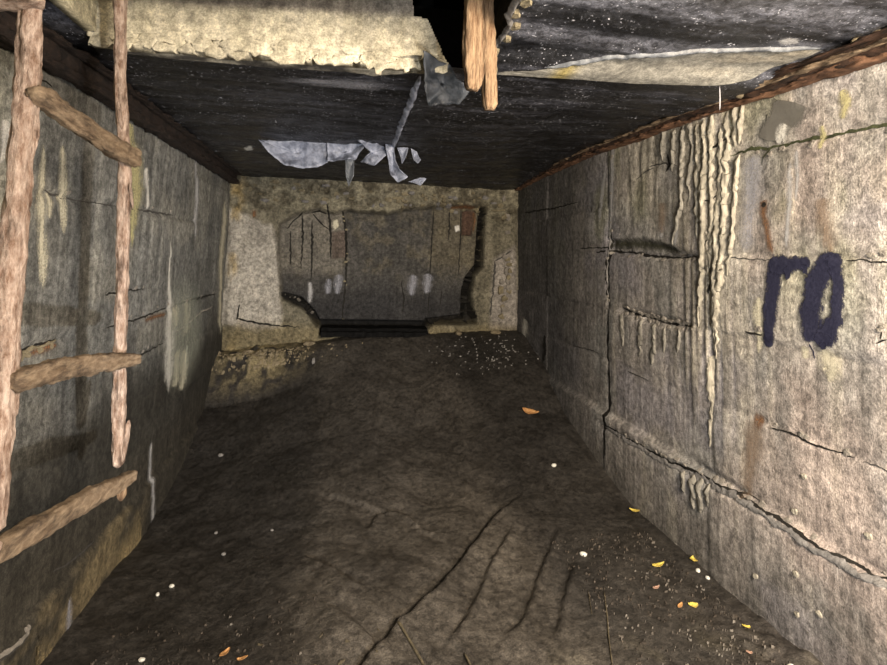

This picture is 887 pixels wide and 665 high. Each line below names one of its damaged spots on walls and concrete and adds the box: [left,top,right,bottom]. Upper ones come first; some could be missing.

spalling [496,0,532,56]
peeling [497,46,821,86]
crack [707,123,887,165]
rust [761,201,773,252]
leakage [660,105,756,447]
crack [21,339,56,362]
crack [540,335,548,361]
crack [575,150,887,589]